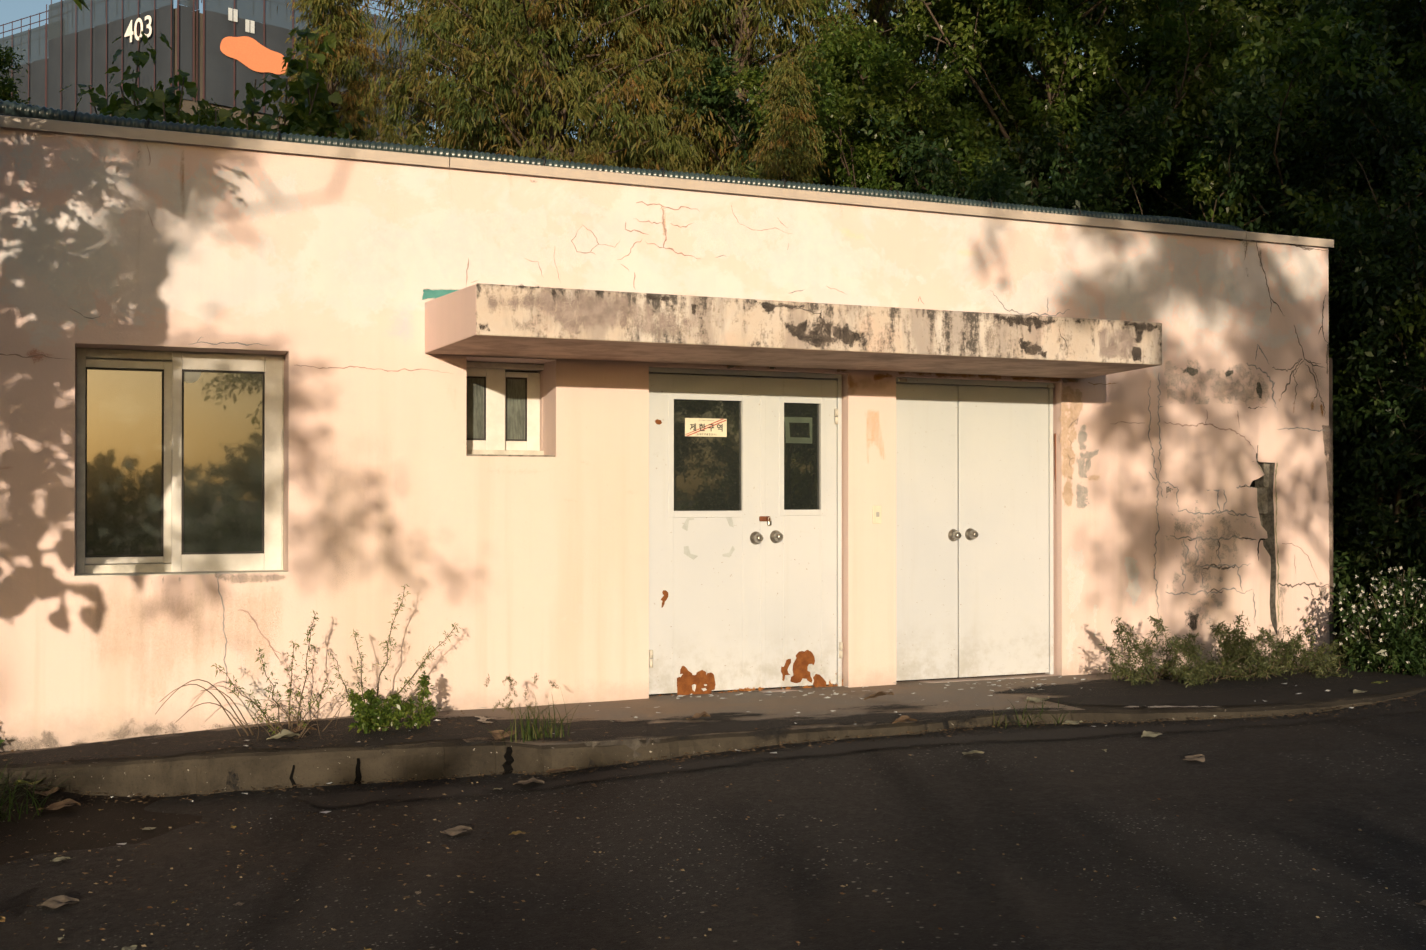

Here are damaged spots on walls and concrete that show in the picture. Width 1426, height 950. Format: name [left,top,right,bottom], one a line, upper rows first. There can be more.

crack [527,201,791,290]
mould [476,284,697,339]
leakage [752,299,867,349]
crack [990,290,1069,346]
flaking render [1164,359,1270,406]
flaking render [1059,385,1102,508]
crack [1063,382,1114,479]
crack [1116,237,1332,641]
flaking render [1322,425,1333,653]
rust [658,650,843,696]